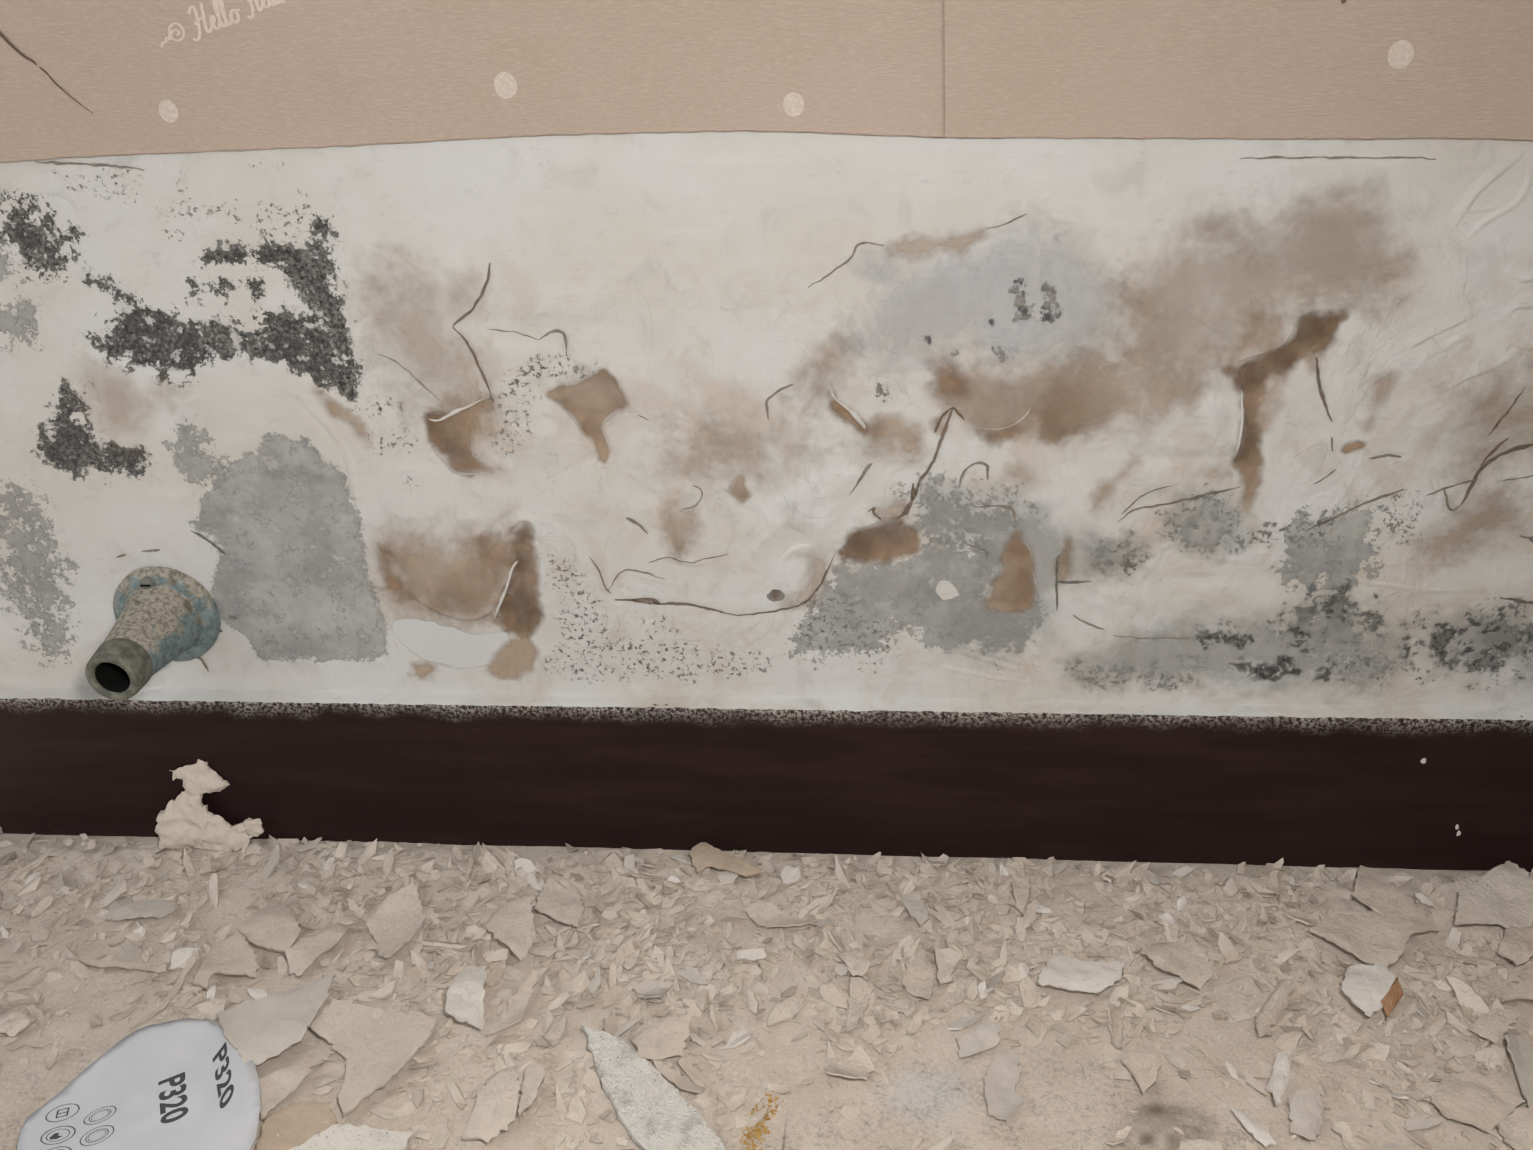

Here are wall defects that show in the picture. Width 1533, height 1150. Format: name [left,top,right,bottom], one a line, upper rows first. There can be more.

spalling [0,168,628,476]
leakage [898,232,1094,362]
spalling [30,378,771,686]
leakage [382,539,514,614]
spalling [786,378,1055,674]
leakage [1432,492,1509,547]
leakage [490,636,535,678]